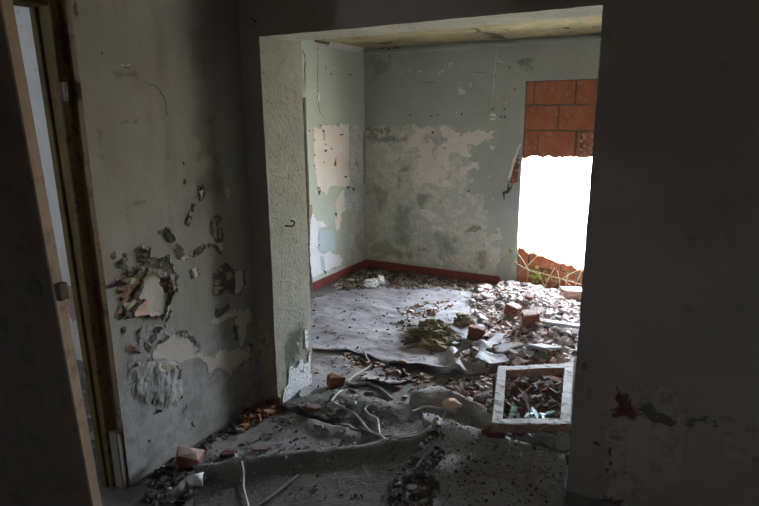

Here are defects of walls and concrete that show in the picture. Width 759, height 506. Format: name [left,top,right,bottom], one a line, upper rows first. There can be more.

peeling [184,183,207,226]
peeling [308,123,503,277]
flaking render [502,143,523,199]
flaking render [111,215,273,381]